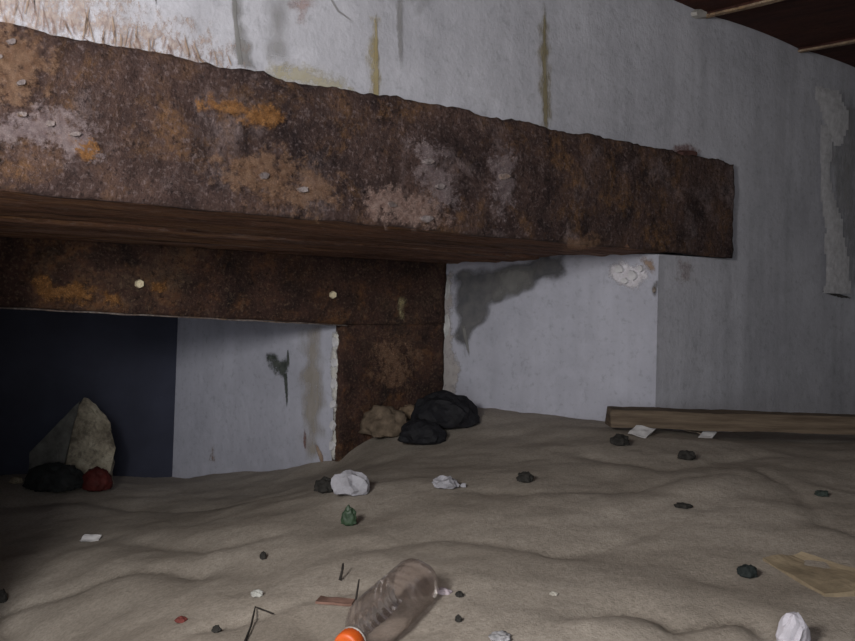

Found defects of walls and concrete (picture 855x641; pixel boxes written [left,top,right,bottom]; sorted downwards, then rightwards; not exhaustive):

corrosion [0,0,236,162]
corrosion [195,93,284,129]
damp [232,0,252,66]
corrosion [369,20,380,96]
corrosion [539,16,550,128]
corrosion [214,152,338,216]
corrosion [363,140,458,230]
corrosion [488,147,517,216]
corrosion [31,274,120,307]
damp [455,256,564,353]
spalling [609,260,657,295]
mould [267,351,289,405]